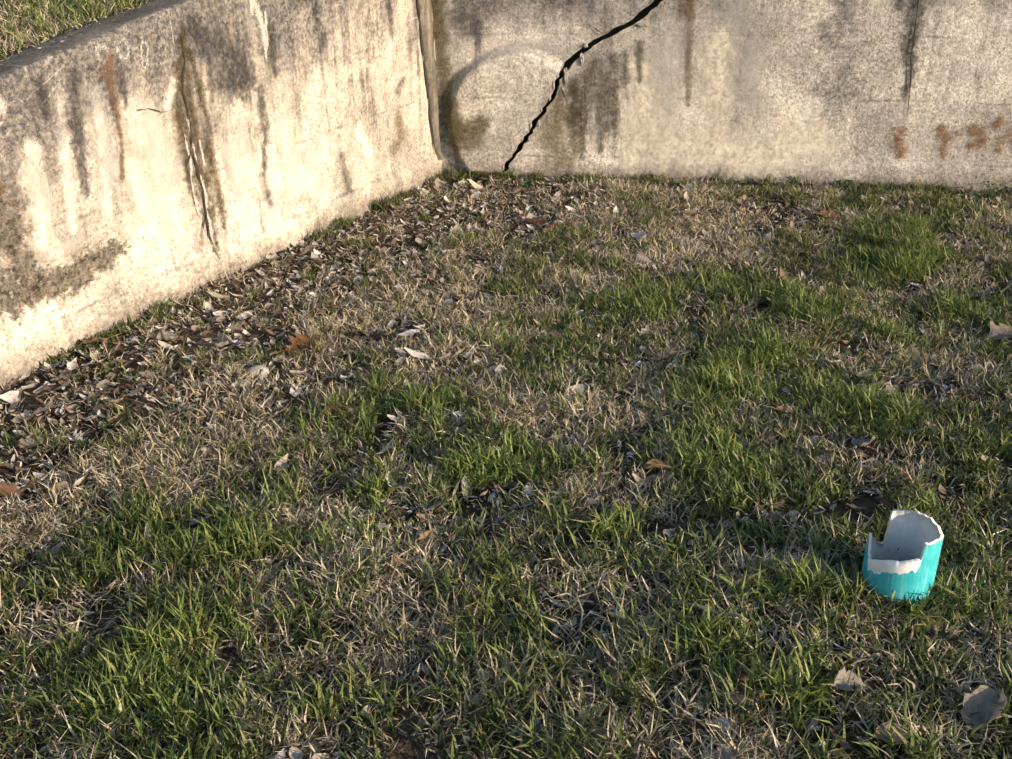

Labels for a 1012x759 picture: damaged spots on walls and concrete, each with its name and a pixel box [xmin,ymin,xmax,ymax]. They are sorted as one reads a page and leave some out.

water stain [21,15,319,269]
water stain [354,122,377,170]
crack [501,0,666,177]
rust [680,0,694,106]
water stain [568,0,860,181]
rust [893,127,907,159]
water stain [896,0,925,98]
rust [936,117,1012,158]